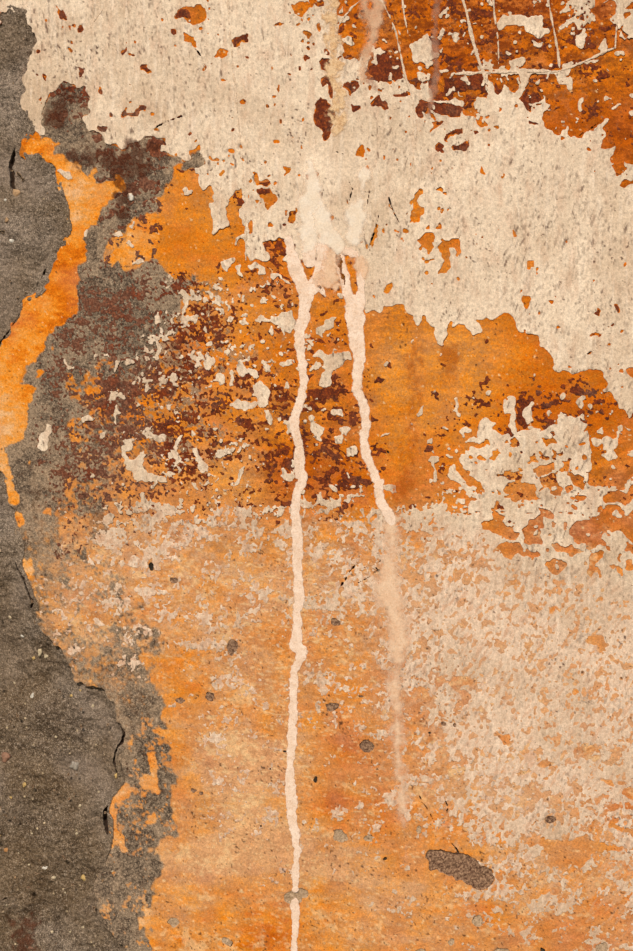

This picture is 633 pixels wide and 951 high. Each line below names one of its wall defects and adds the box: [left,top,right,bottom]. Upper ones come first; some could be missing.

peeling [274,0,633,188]
crack [9,150,17,189]
peeling [360,189,467,284]
peeling [299,254,633,592]
spalling [0,0,300,951]
damp [284,159,410,951]
crack [114,729,125,771]
crack [102,806,110,834]
spalling [331,805,348,842]
spalling [426,844,498,890]